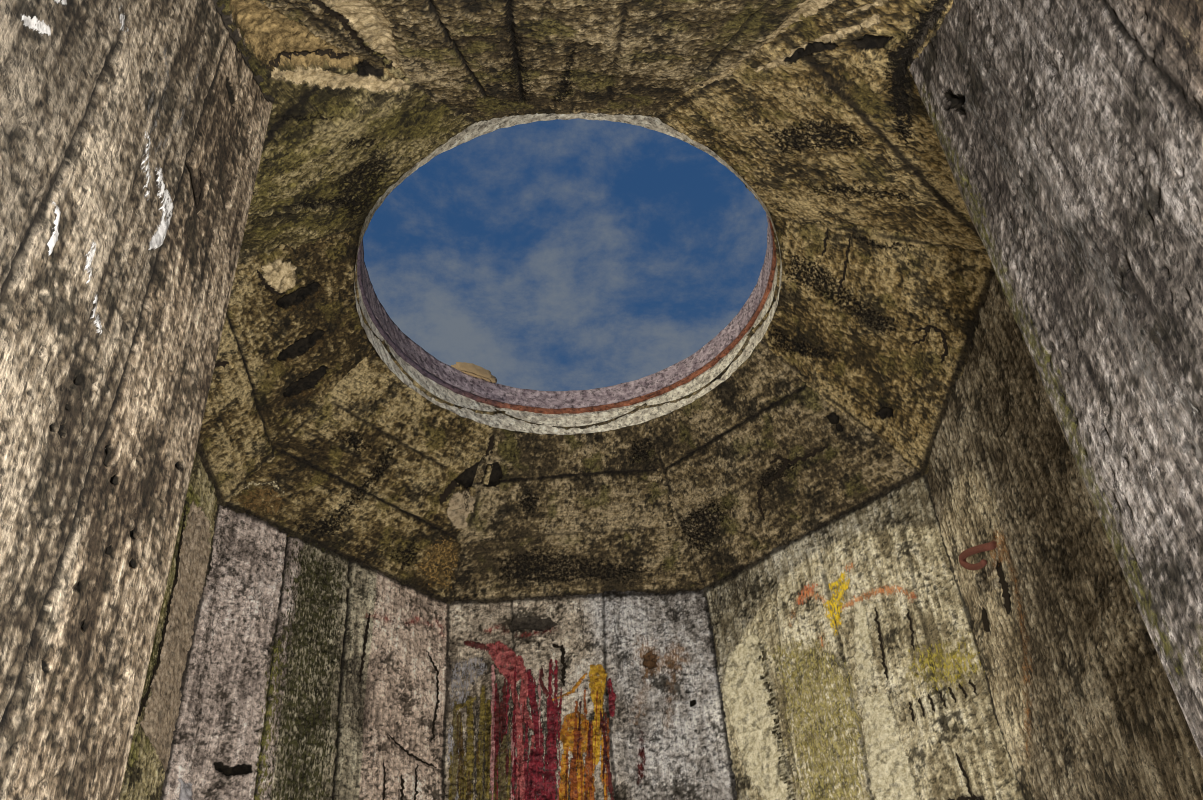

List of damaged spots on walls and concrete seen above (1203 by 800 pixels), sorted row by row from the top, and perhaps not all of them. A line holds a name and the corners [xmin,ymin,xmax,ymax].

peeling [691,0,950,150]
spalling [439,435,503,529]
leakage [140,533,181,706]
leakage [186,430,402,800]
peeling [853,599,918,800]